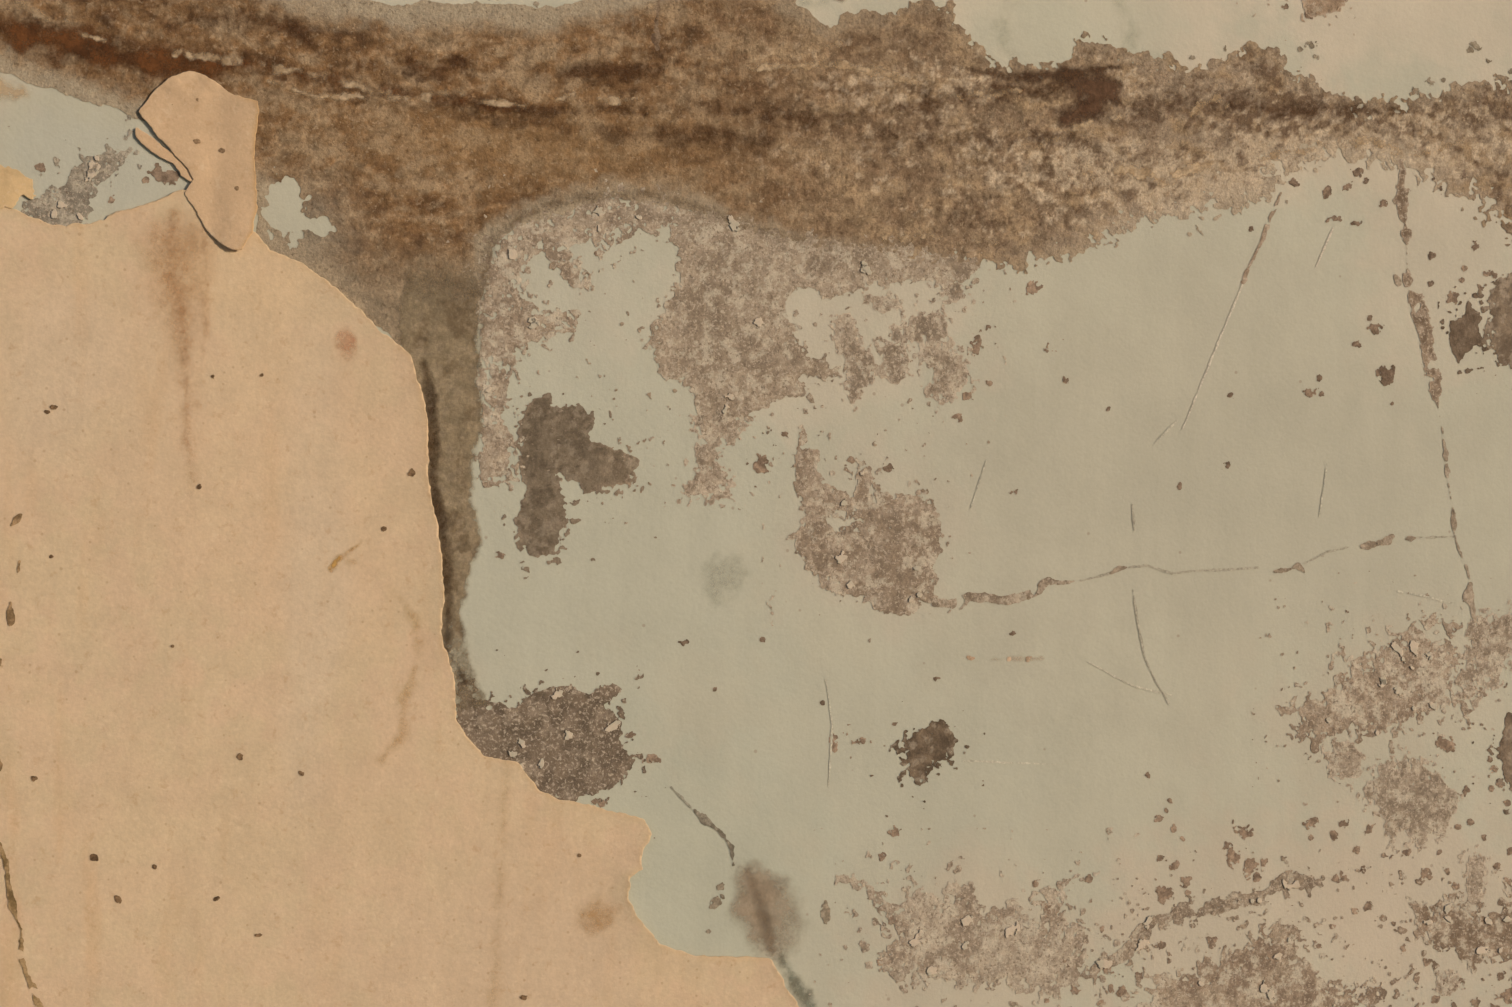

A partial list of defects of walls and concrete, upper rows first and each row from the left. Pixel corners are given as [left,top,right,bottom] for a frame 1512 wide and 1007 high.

peeling [0,71,816,1007]
peeling [458,169,1043,616]
damp [0,0,1512,709]
peeling [819,575,1512,1007]
crack [931,159,1476,705]